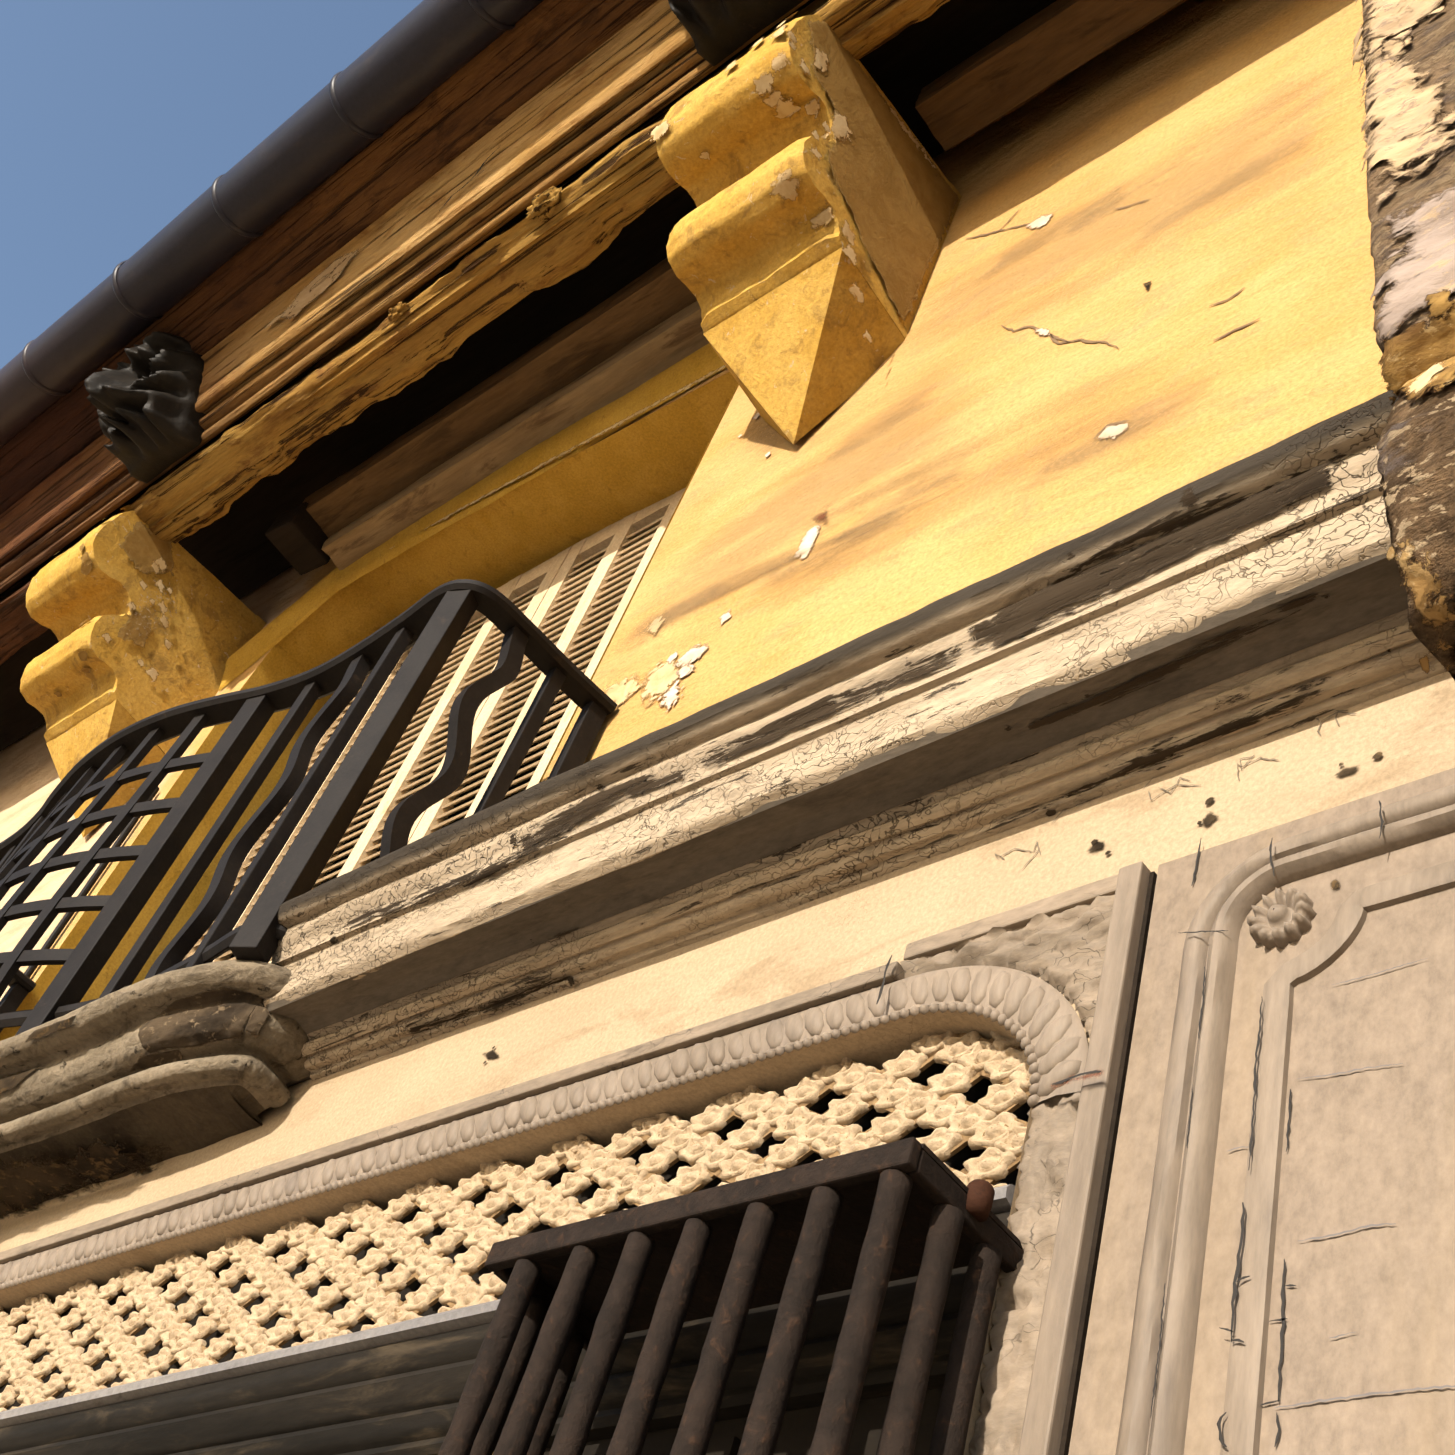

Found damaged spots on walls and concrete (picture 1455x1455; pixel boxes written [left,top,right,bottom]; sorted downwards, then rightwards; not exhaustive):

peeling [650,119,672,141]
peeling [752,11,958,320]
peeling [1351,0,1455,405]
crack [1001,325,1118,349]
peeling [420,365,726,532]
spalling [1093,419,1129,441]
peeling [80,543,93,575]
peeling [102,505,181,682]
peeling [329,449,1371,944]
peeling [1335,752,1382,777]
peeling [405,966,586,1033]